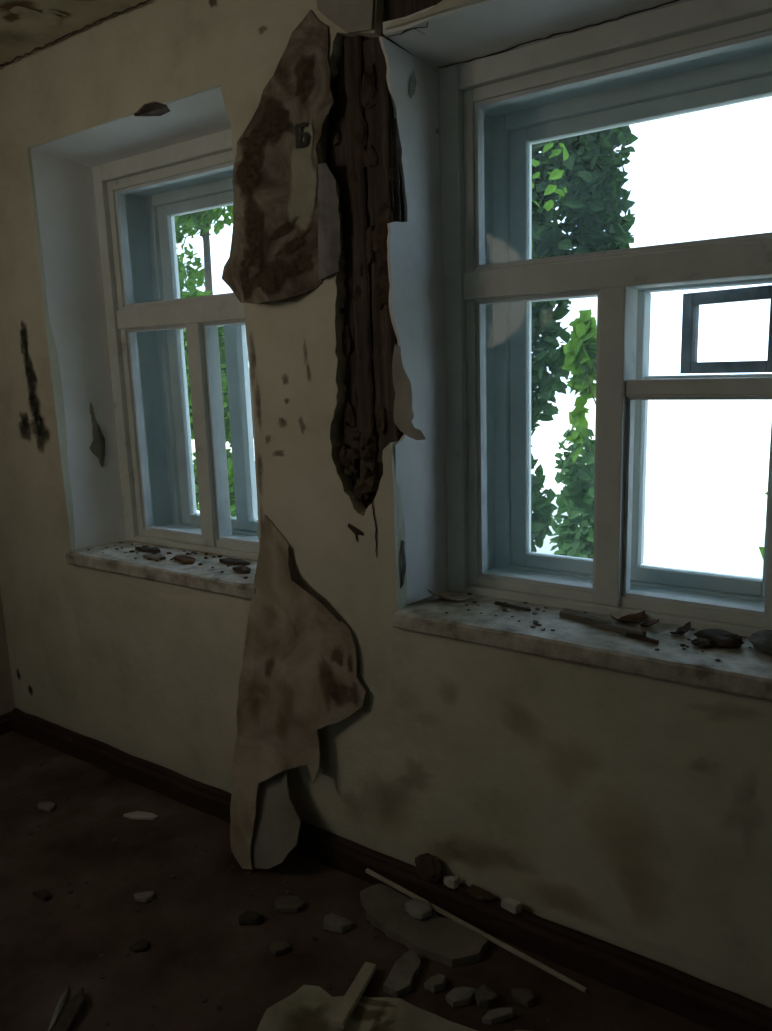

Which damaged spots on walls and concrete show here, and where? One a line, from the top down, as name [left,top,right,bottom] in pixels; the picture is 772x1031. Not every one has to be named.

peeling [90,402,105,467]
peeling [219,558,251,574]